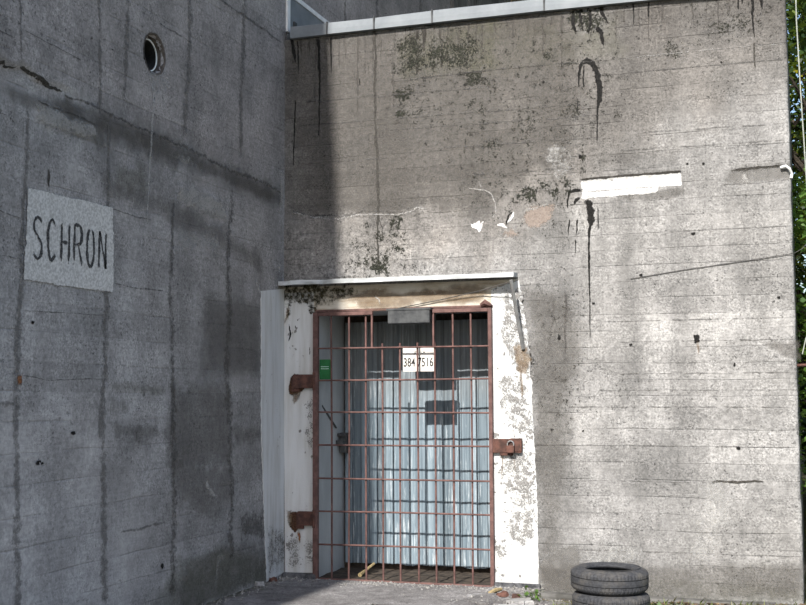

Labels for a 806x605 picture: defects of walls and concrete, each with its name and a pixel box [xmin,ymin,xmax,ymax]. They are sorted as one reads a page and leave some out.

leakage [660,0,785,59]
crack [0,60,96,126]
leakage [377,2,650,455]
corrosion [289,374,304,403]
peeling [497,283,535,437]
corrosion [287,511,301,541]
peeling [500,451,539,546]